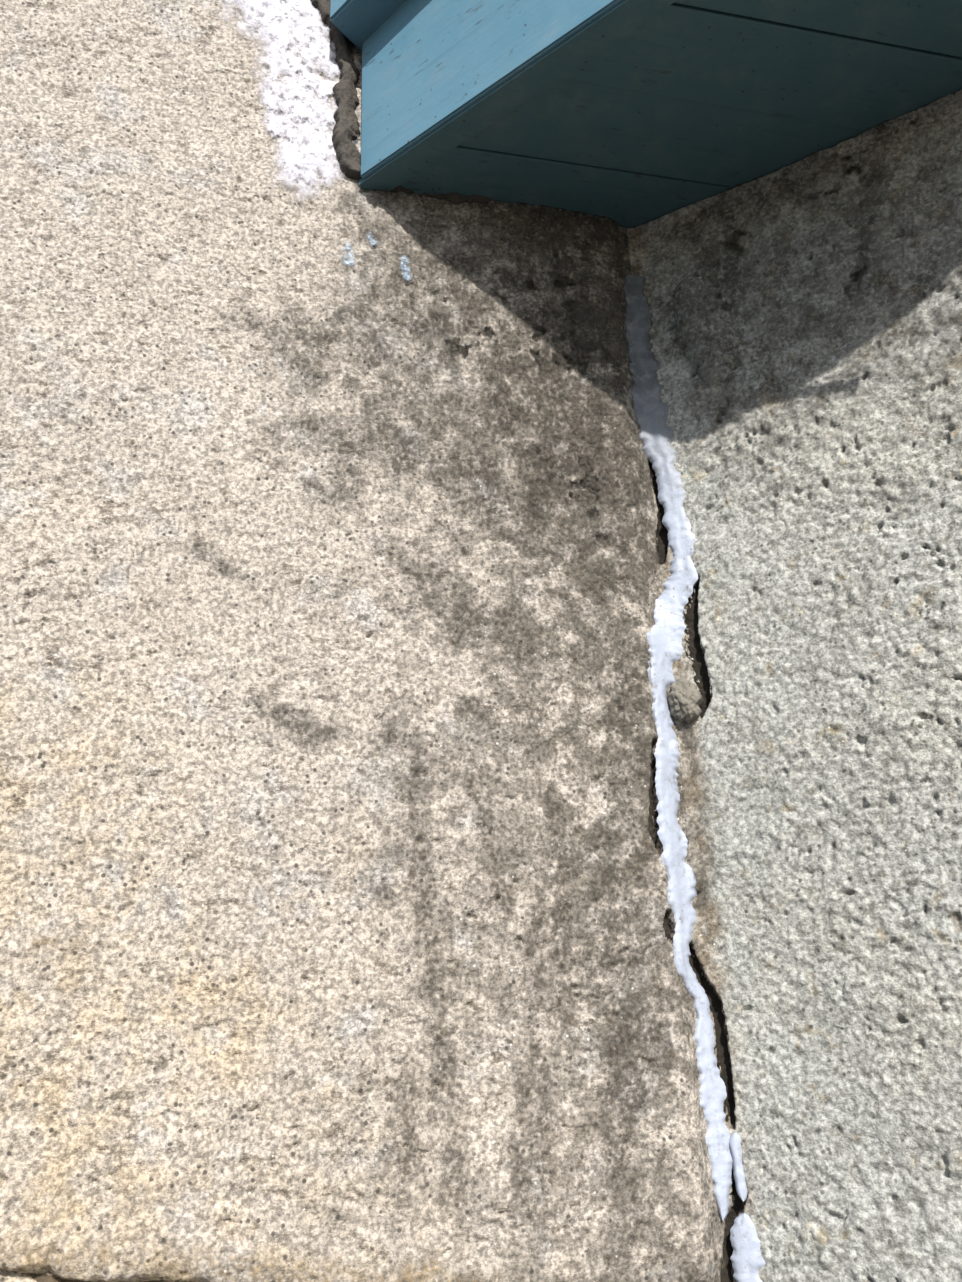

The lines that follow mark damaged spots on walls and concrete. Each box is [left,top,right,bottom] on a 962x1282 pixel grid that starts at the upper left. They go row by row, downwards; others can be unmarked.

water stain [224,303,460,470]
water stain [342,182,653,784]
water stain [258,701,336,739]
water stain [386,725,448,1008]
water stain [464,772,492,847]
water stain [493,868,514,915]
water stain [530,786,574,984]
crack [622,273,766,1282]
water stain [590,828,672,1203]
water stain [403,1082,418,1163]
water stain [515,1043,554,1240]
crack [5,1270,84,1282]